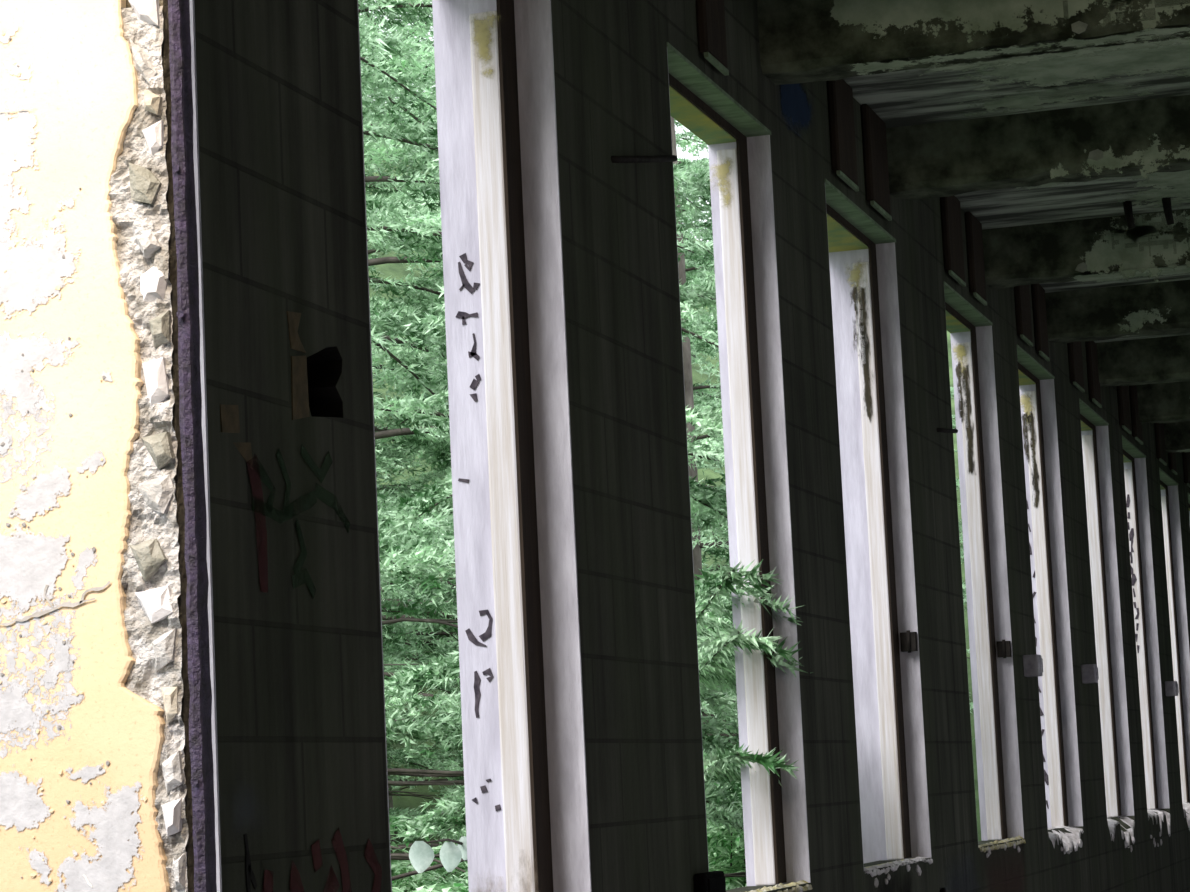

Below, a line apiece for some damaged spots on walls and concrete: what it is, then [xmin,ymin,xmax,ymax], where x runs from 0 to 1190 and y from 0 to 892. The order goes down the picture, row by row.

peeling [830,0,1190,116]
peeling [1015,133,1190,285]
spalling [286,311,343,420]
peeling [1118,308,1171,338]
spalling [0,0,188,892]